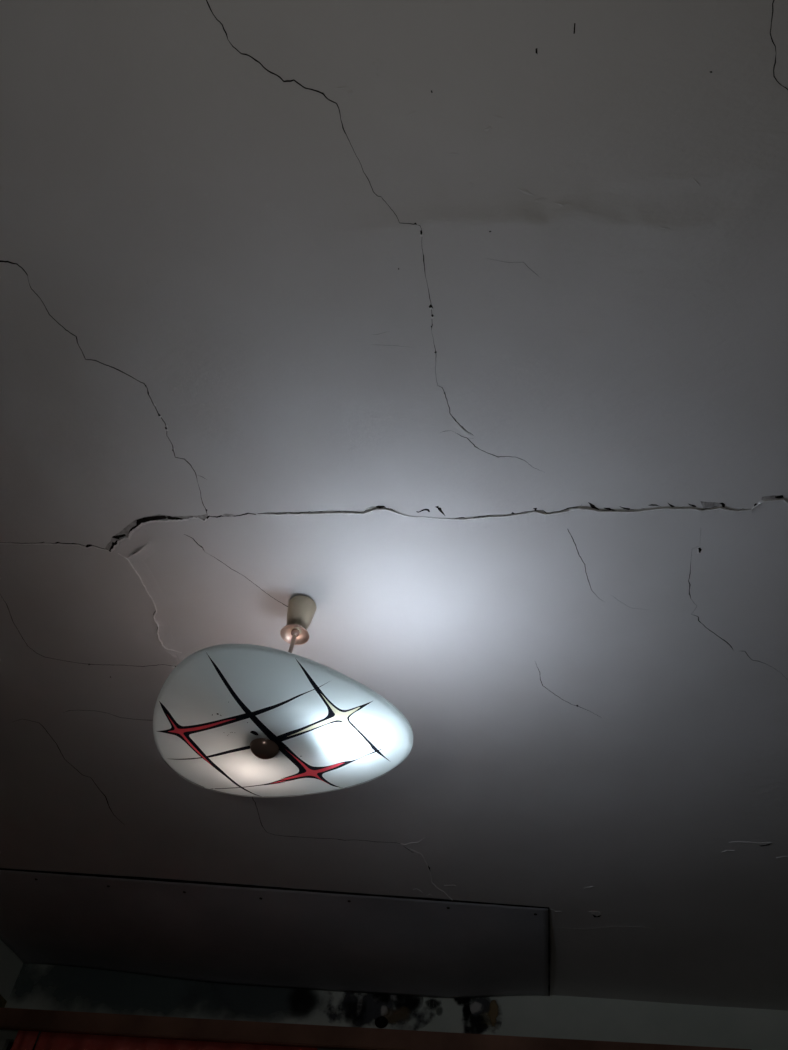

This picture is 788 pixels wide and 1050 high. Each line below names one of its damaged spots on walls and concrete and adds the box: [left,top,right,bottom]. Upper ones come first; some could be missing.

crack [206,0,534,468]
crack [770,0,788,90]
flaking render [105,514,214,665]
crack [0,260,788,675]